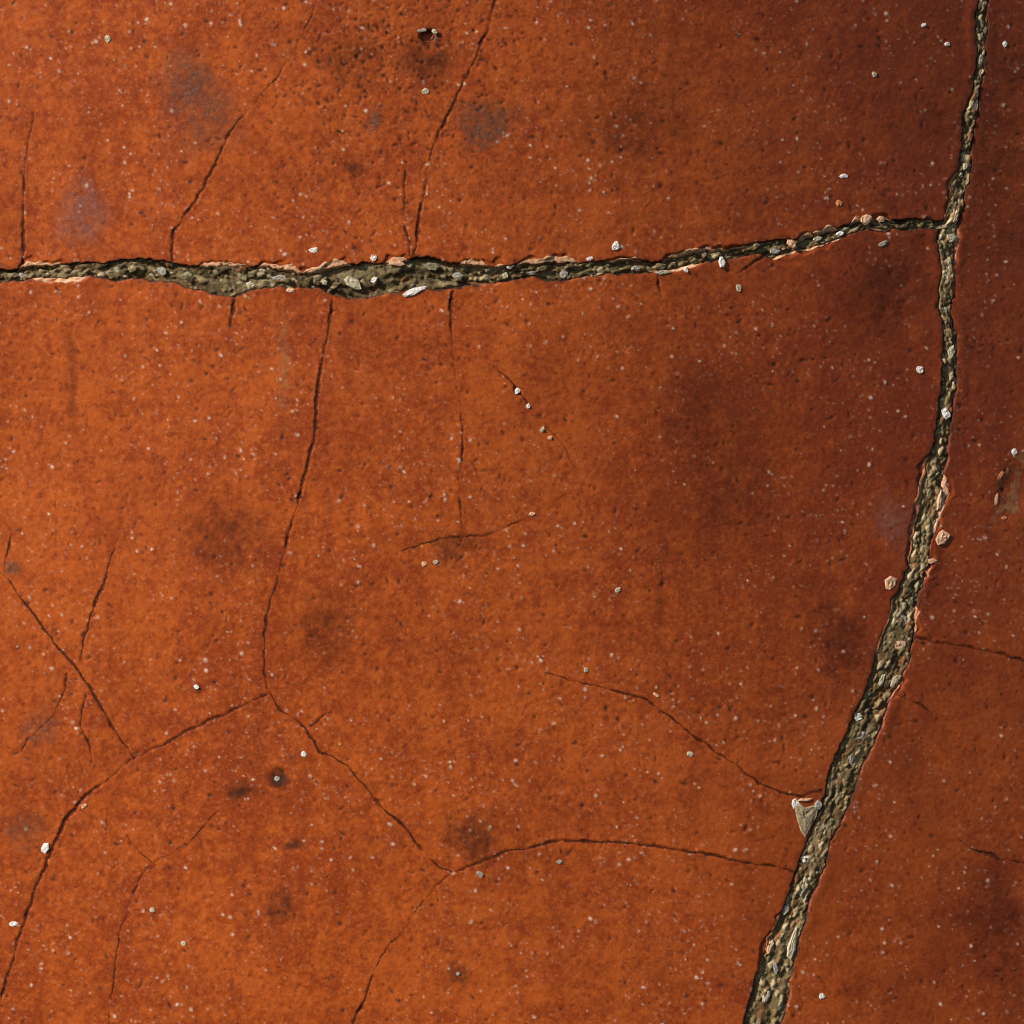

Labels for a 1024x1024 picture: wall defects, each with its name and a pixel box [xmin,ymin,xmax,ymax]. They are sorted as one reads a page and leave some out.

crack [428,0,496,161]
crack [170,115,244,261]
crack [0,202,947,324]
crack [281,301,334,560]
crack [400,414,535,566]
crack [498,370,574,466]
crack [743,0,988,1024]
peeling [995,454,1024,520]
crack [1,548,421,999]
crack [545,668,731,762]
crack [431,839,775,885]
crack [352,896,428,1024]